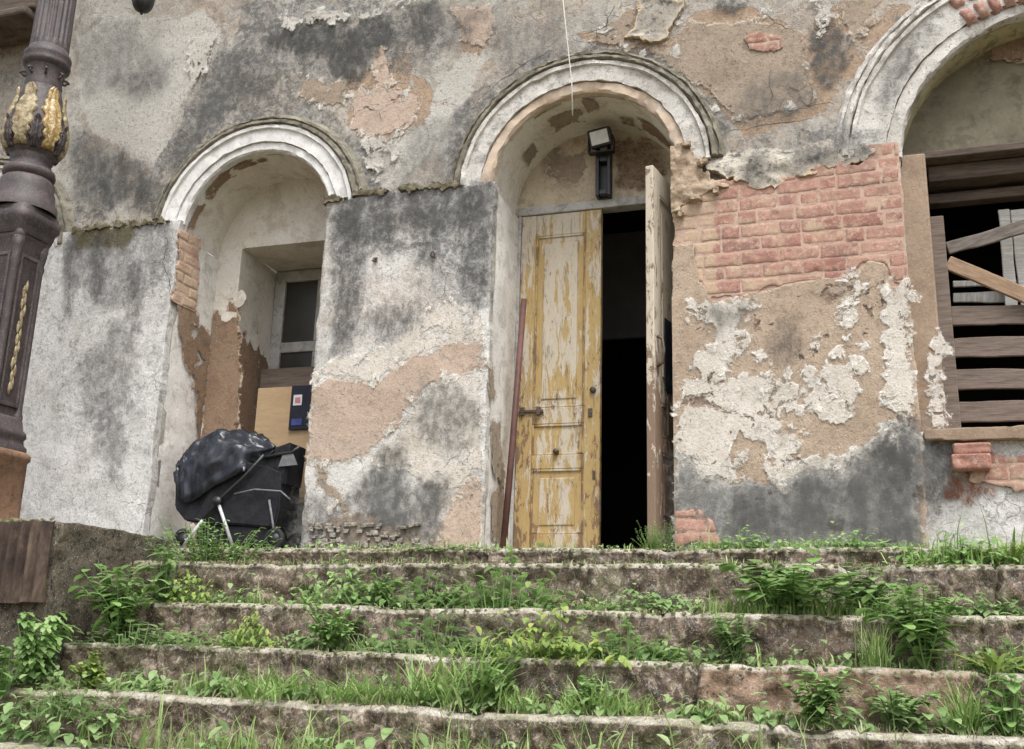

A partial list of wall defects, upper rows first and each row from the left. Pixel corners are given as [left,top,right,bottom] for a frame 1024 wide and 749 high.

damp [266,19,396,82]
flaking render [170,158,266,325]
damp [326,180,491,344]
flaking render [619,117,954,550]
peeling [304,296,509,549]
damp [678,421,952,547]
flaking render [969,451,1024,492]